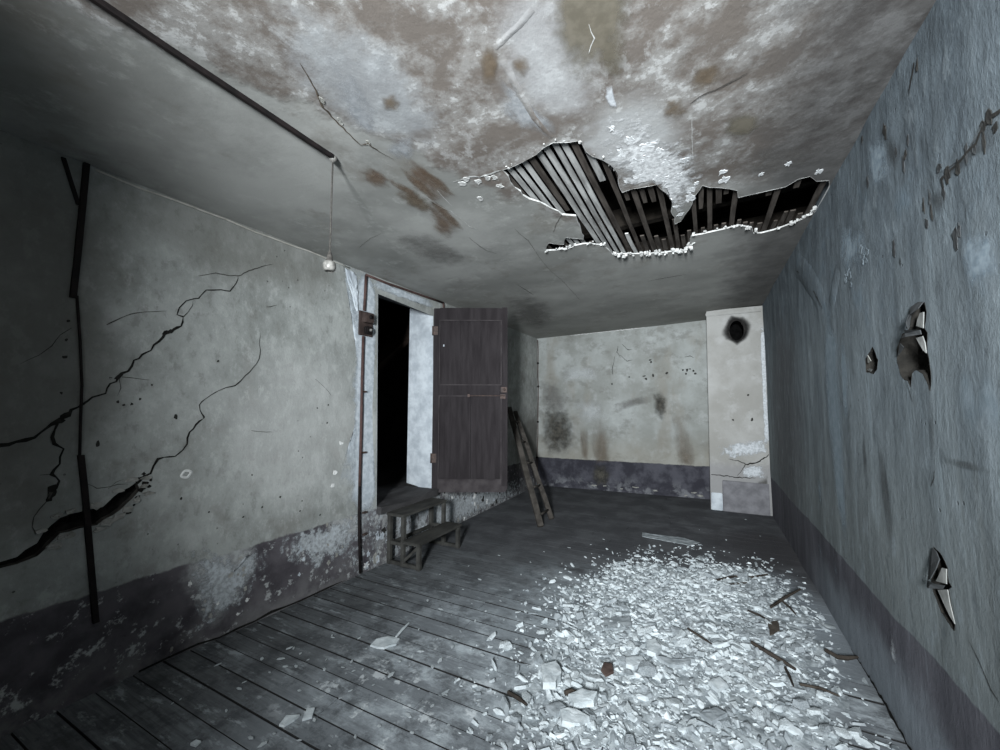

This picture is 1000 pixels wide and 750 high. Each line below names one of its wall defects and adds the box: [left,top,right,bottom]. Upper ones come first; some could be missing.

damp [560,0,623,73]
crack [301,65,394,160]
damp [606,88,616,106]
damp [406,168,449,232]
peeling [608,119,701,217]
damp [869,144,887,183]
spalling [922,108,1000,229]
spalling [952,222,961,251]
crack [0,264,271,568]
damp [545,415,570,450]
damp [656,398,665,415]
crack [711,454,769,479]